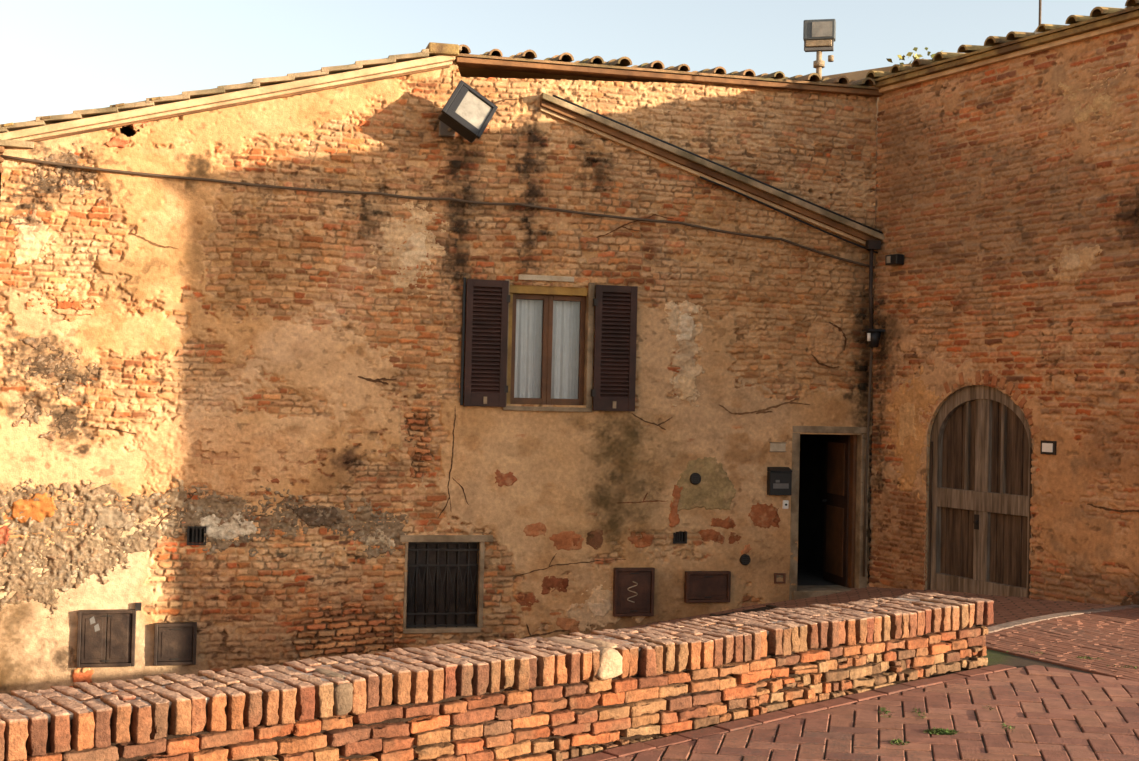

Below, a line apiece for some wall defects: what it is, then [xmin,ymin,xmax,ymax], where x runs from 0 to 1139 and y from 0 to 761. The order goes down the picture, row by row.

peeling [10,122,150,265]
crack [130,232,178,249]
peeling [368,201,451,298]
damp [441,187,480,279]
damp [508,108,549,255]
crack [719,398,810,415]
crack [437,410,469,519]
spalling [0,478,409,619]
spalling [698,516,752,555]
spalling [748,503,781,529]